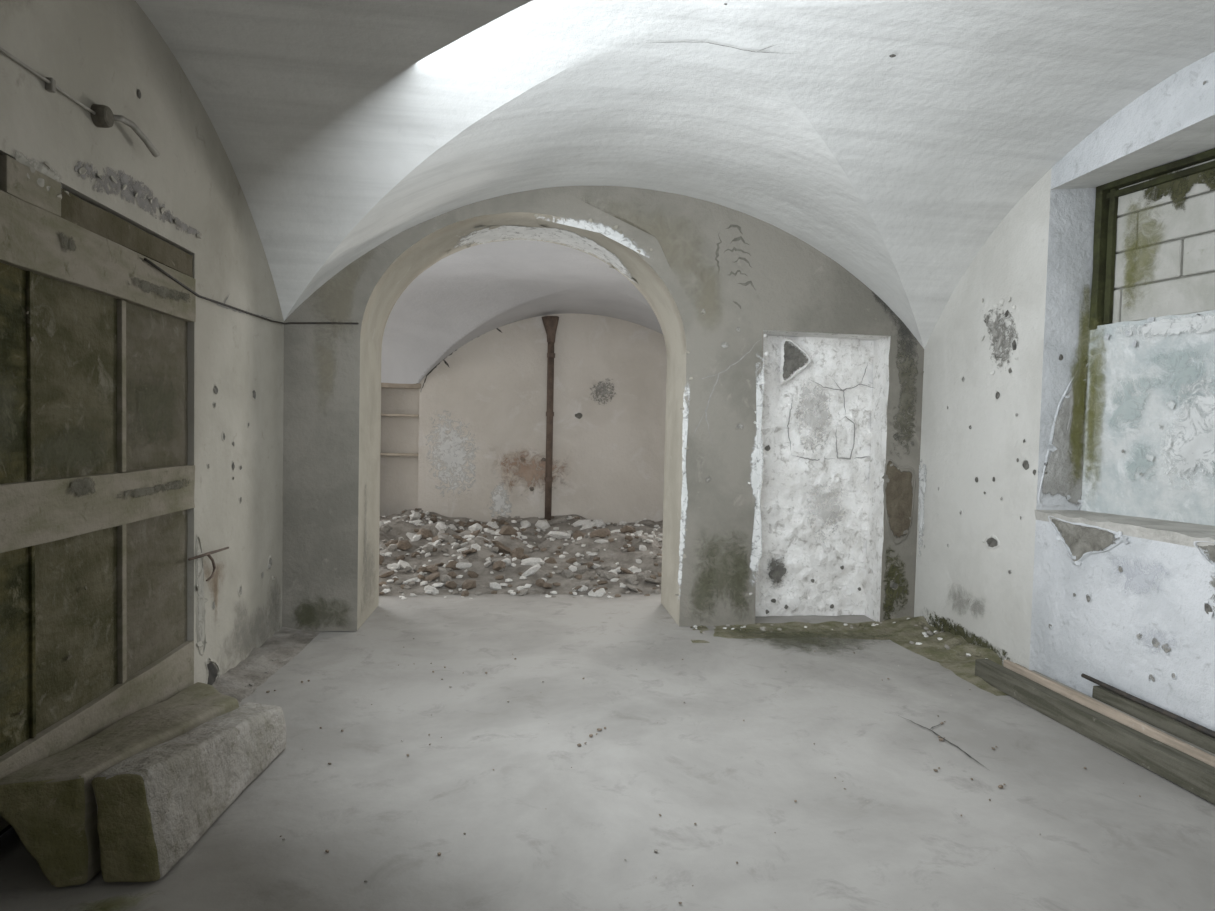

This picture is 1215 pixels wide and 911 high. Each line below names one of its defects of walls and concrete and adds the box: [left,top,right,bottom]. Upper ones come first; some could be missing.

peeling [75,161,201,239]
flaking render [981,297,1018,375]
leakage [1072,291,1096,467]
flaking render [1193,541,1215,617]
flaking render [1136,632,1171,656]